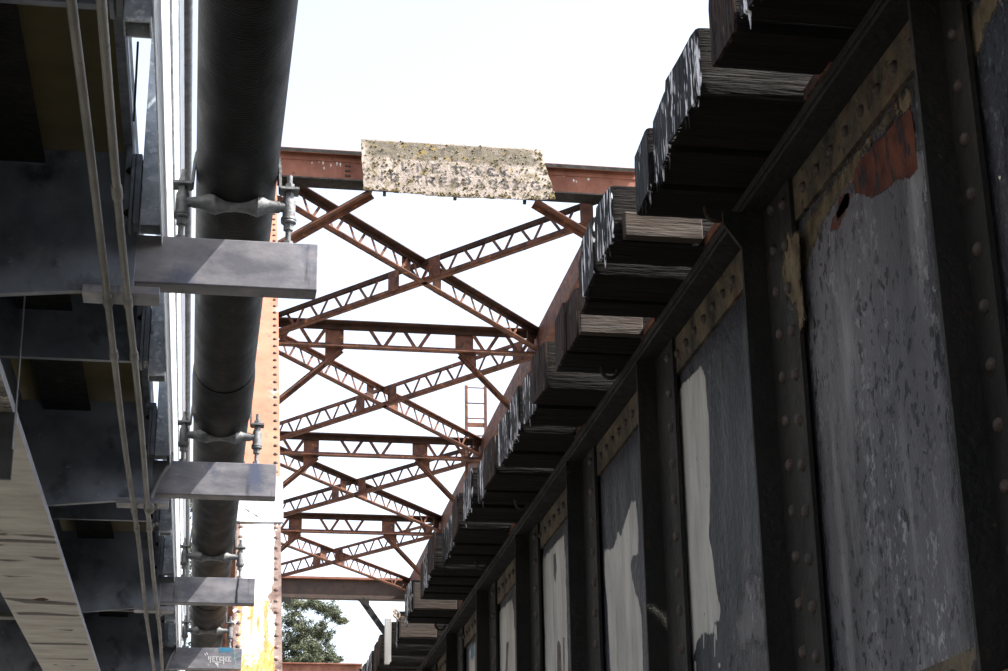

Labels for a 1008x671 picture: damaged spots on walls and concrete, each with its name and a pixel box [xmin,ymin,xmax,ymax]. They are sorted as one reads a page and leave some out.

rust [236,600,276,671]
peeling [604,500,643,671]
peeling [678,366,720,671]